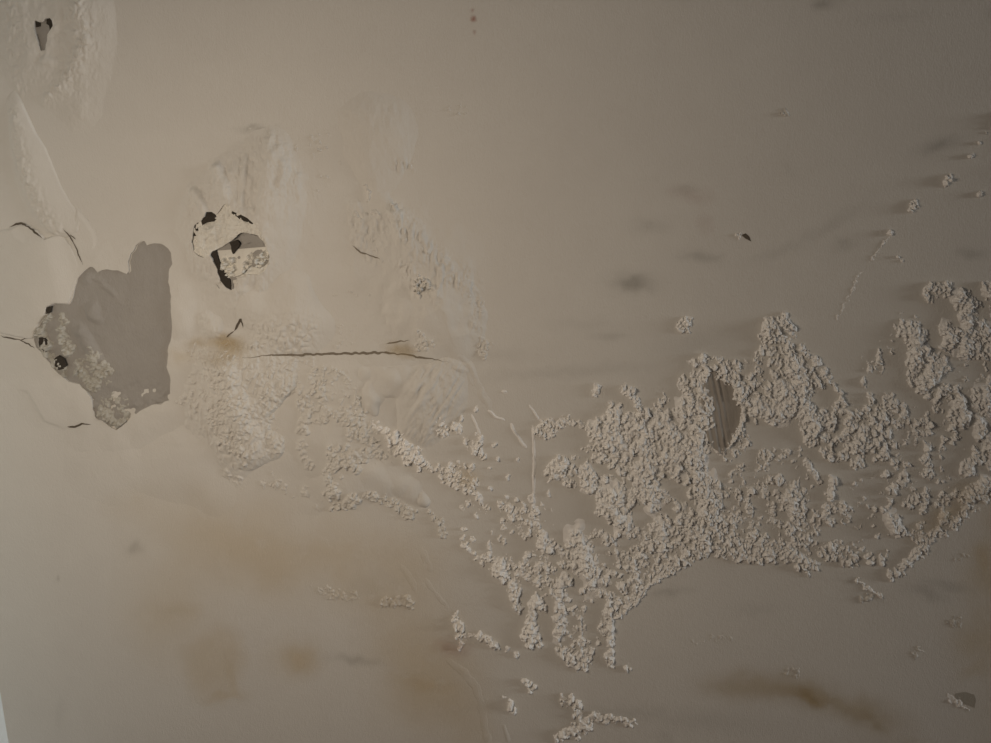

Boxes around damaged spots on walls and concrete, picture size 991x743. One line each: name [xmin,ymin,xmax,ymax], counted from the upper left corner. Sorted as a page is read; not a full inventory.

spalling [0,207,208,452]
crack [242,340,443,362]
peeling [355,280,991,673]